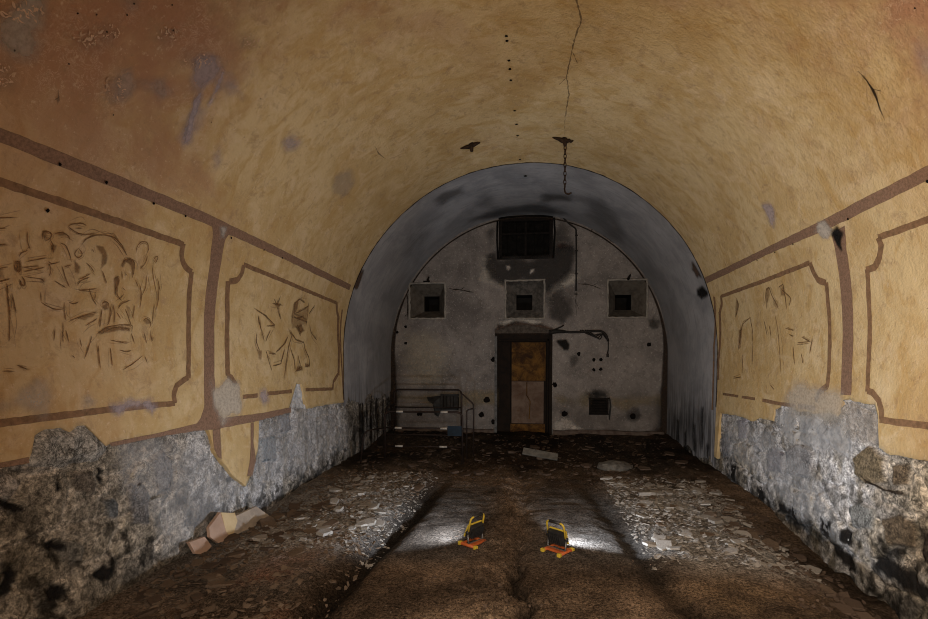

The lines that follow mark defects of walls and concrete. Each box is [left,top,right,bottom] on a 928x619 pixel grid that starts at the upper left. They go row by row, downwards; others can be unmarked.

crack [560,0,582,108]
crack [861,74,883,115]
leakage [483,245,575,322]